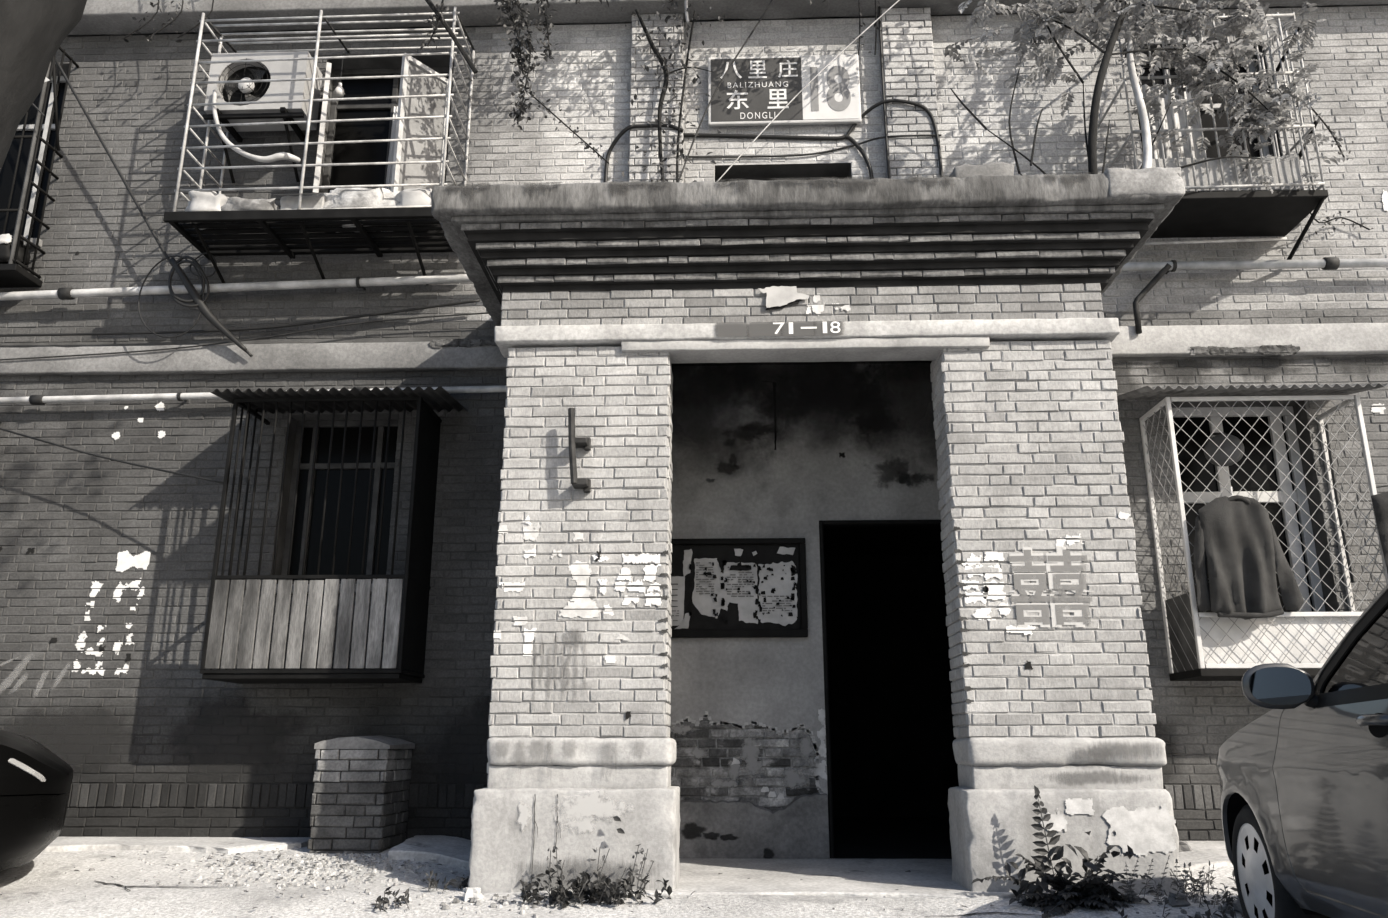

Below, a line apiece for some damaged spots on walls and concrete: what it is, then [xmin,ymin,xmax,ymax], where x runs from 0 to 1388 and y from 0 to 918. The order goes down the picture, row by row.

peeling [806,293,851,316]
peeling [1056,534,1084,547]
peeling [72,550,151,676]
peeling [493,616,537,656]
peeling [498,515,668,633]
peeling [605,634,630,663]
peeling [954,549,1036,635]
spalling [669,704,828,812]
peeling [1041,798,1177,856]